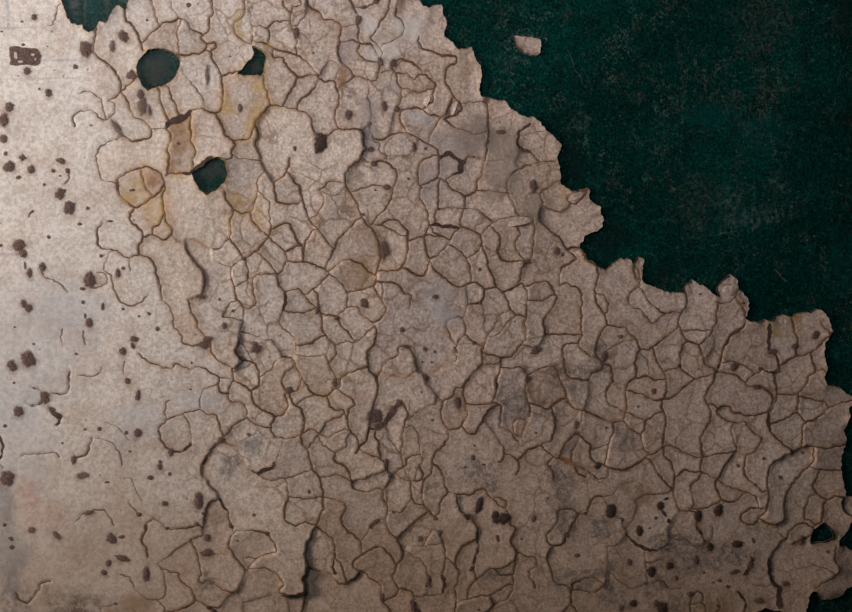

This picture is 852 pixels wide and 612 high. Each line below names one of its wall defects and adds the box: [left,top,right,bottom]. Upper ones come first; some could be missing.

peeling [61,0,129,32]
peeling [136,48,180,91]
peeling [237,46,267,76]
peeling [192,157,228,195]
peeling [420,0,852,396]
crack [75,0,573,612]
crack [517,181,852,612]
peeling [841,406,852,497]
spalling [464,497,483,520]
spalling [492,511,511,524]
peeling [810,522,852,551]
peeling [806,587,852,612]